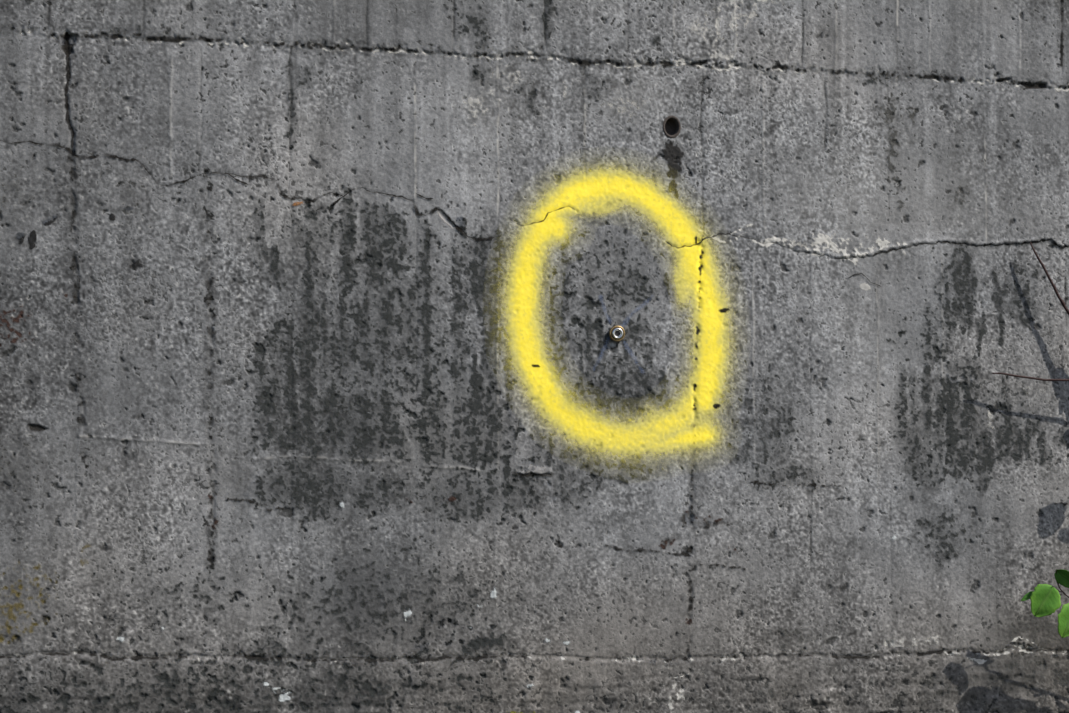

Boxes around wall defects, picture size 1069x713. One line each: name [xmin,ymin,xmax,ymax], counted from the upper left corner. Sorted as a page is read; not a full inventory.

crack [0,32,575,241]
damp [250,183,679,525]
crack [666,233,1069,286]
damp [887,240,1069,492]